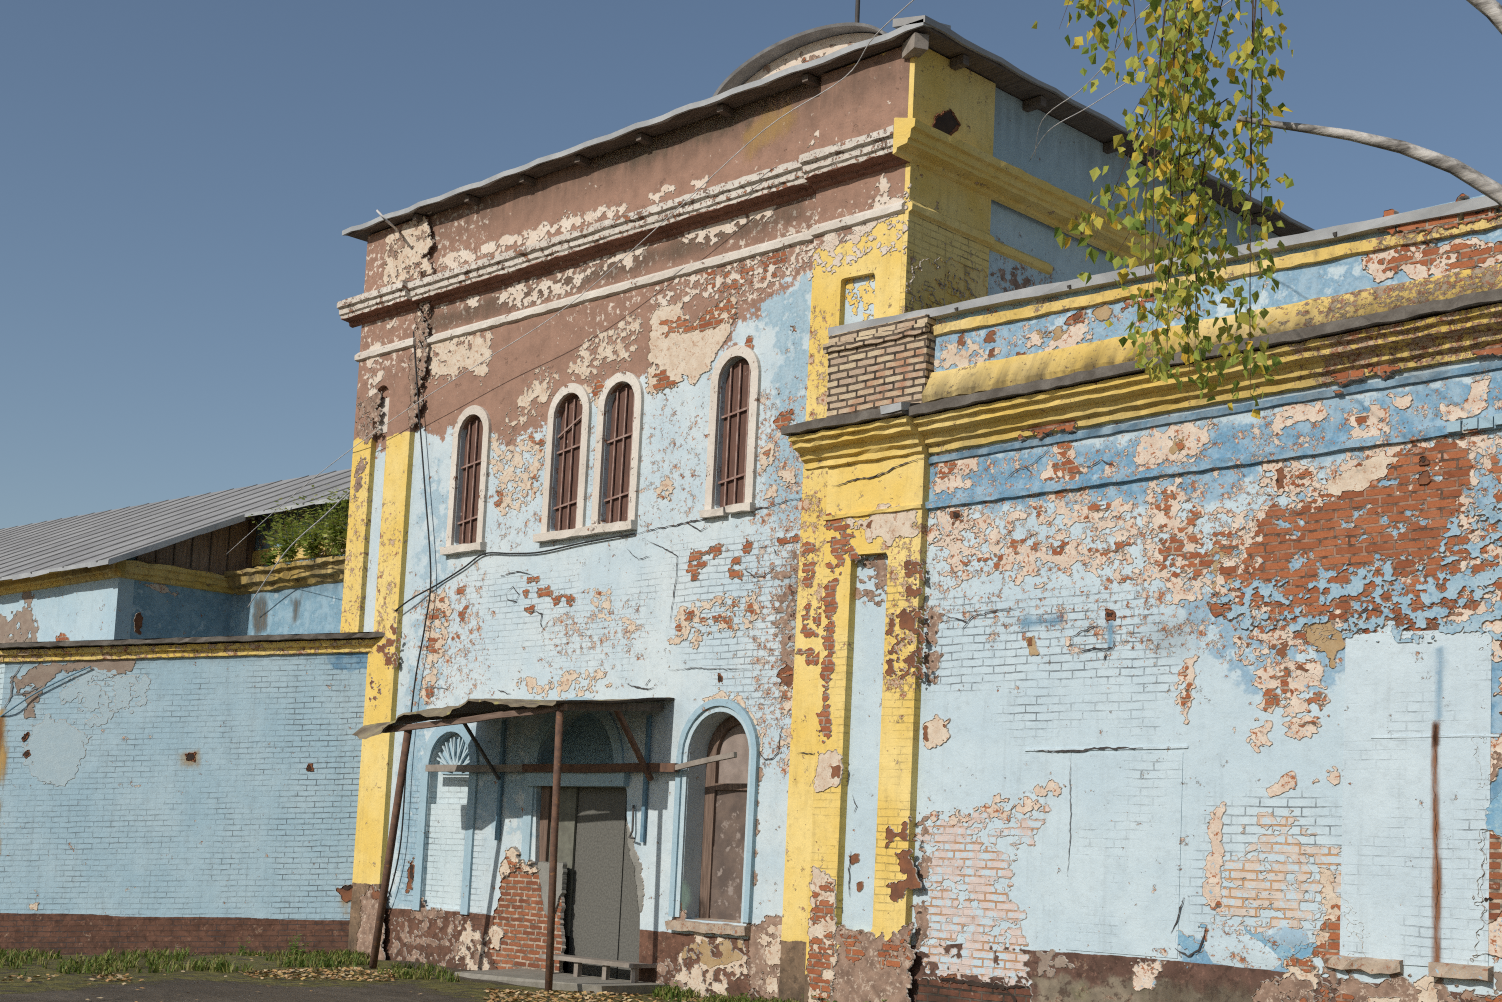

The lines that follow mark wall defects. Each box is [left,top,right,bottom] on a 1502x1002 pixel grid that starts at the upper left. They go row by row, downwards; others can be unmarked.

peeling [352,243,650,499]
flaking render [383,201,629,286]
flaking render [489,173,1031,516]
spalling [1361,193,1502,284]
peeling [10,659,151,787]
spalling [522,575,637,634]
spalling [667,355,1502,886]
spalling [336,846,567,973]
flaking render [653,910,782,1000]
peeling [805,779,1075,1002]
peeling [1130,733,1502,1002]
corrosion [1432,722,1441,962]